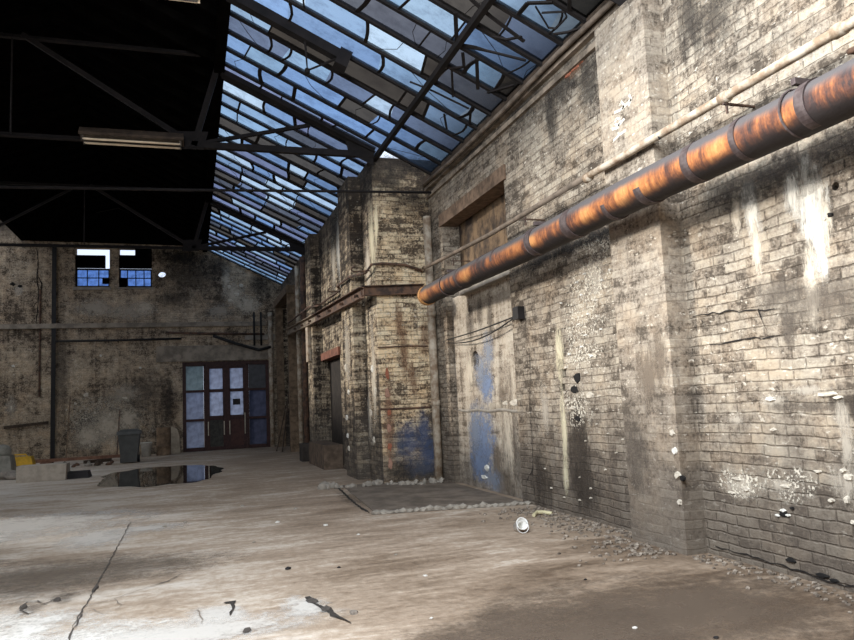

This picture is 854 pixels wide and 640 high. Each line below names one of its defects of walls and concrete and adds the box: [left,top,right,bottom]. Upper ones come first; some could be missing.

damp [759,158,854,343]
peeling [466,336,517,491]
damp [555,332,564,379]
damp [560,393,598,510]
damp [797,396,854,418]
damp [420,577,829,640]